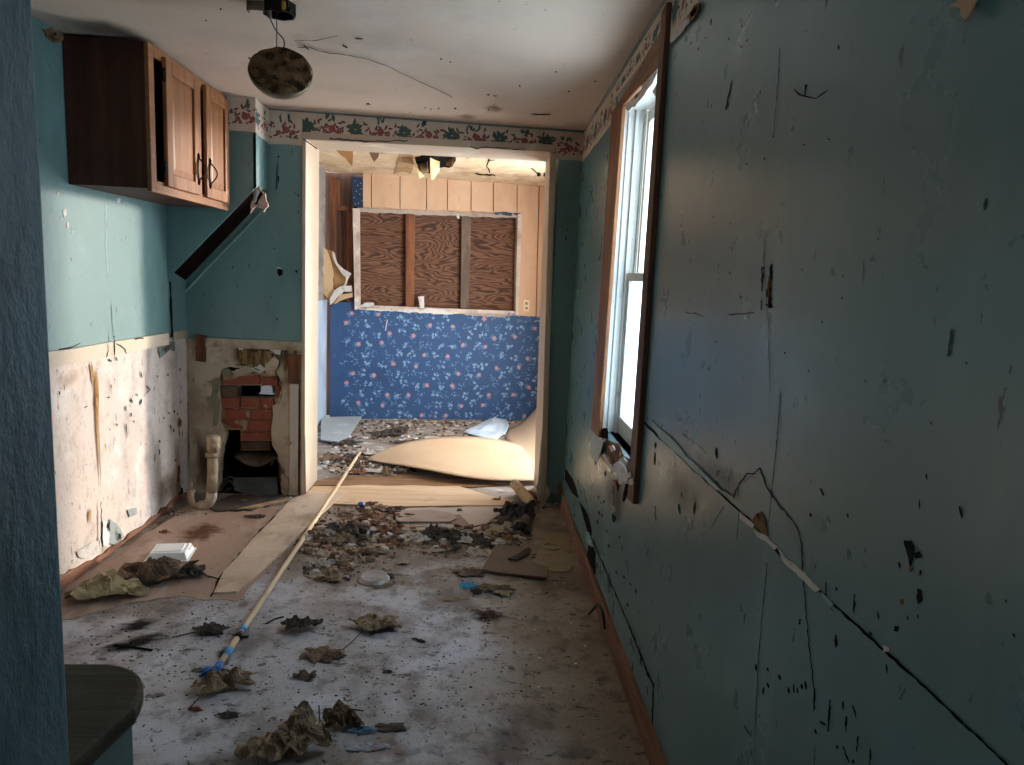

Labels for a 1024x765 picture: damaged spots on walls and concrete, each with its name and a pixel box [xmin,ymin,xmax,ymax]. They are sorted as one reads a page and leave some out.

flaking render [158,342,175,358]
flaking render [206,348,281,451]
spalling [752,512,769,536]
crack [644,234,1008,765]